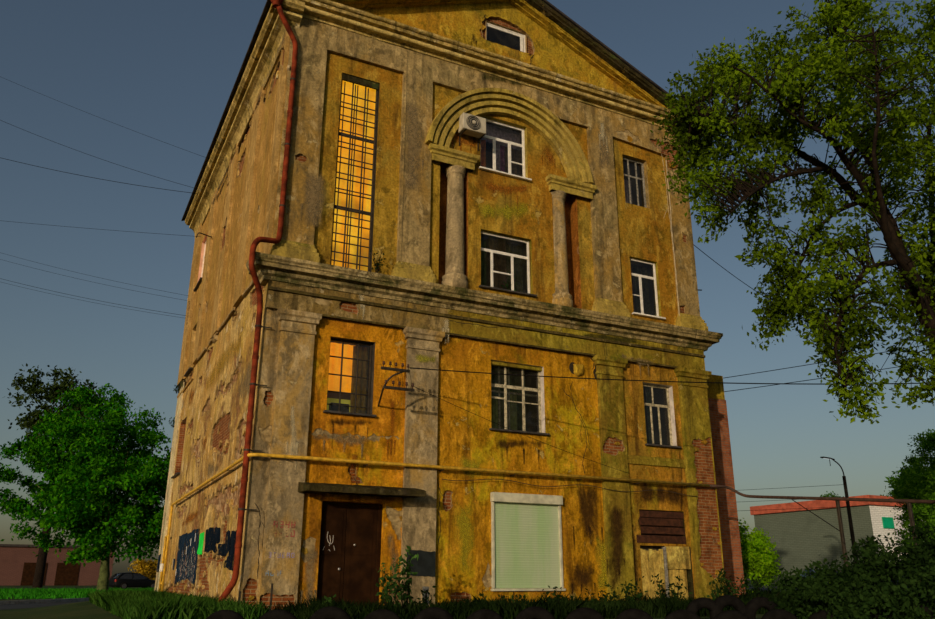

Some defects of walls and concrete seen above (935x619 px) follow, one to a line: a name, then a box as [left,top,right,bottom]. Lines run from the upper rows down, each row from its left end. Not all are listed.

spalling [213,45,290,206]
spalling [187,356,247,467]
spalling [204,477,241,542]
spalling [166,550,296,611]
leakage [572,565,595,593]
leakage [573,487,640,589]
leakage [641,483,683,504]
spalling [692,437,724,579]